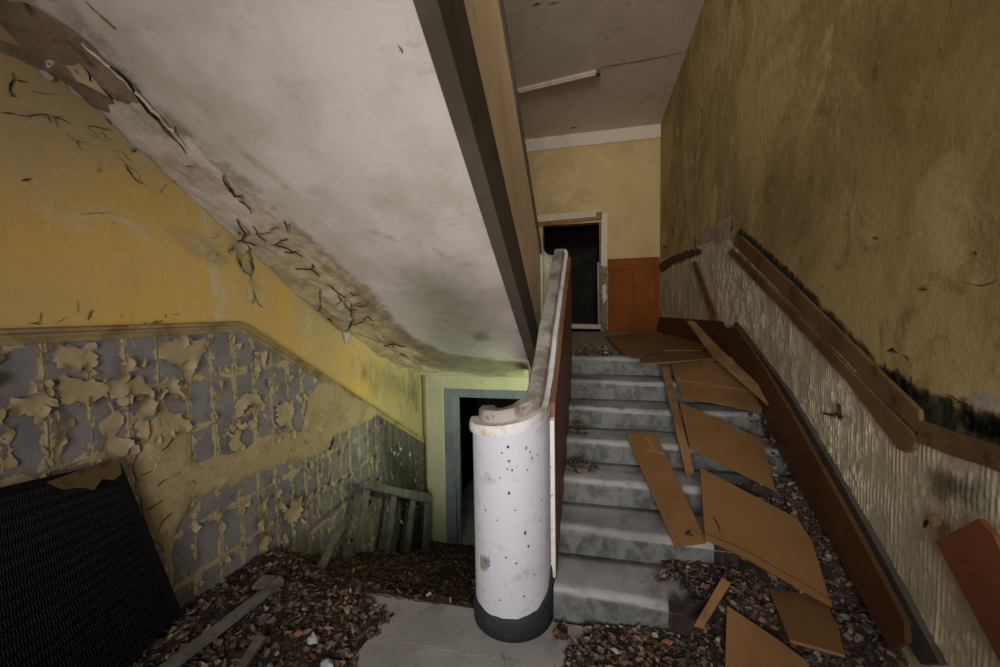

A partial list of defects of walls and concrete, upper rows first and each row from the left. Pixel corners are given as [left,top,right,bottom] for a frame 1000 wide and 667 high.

crack [1,67,191,194]
flaking render [0,0,261,201]
flaking render [0,335,385,552]
crack [206,174,383,325]
water stain [398,331,525,376]
water stain [737,229,1000,446]